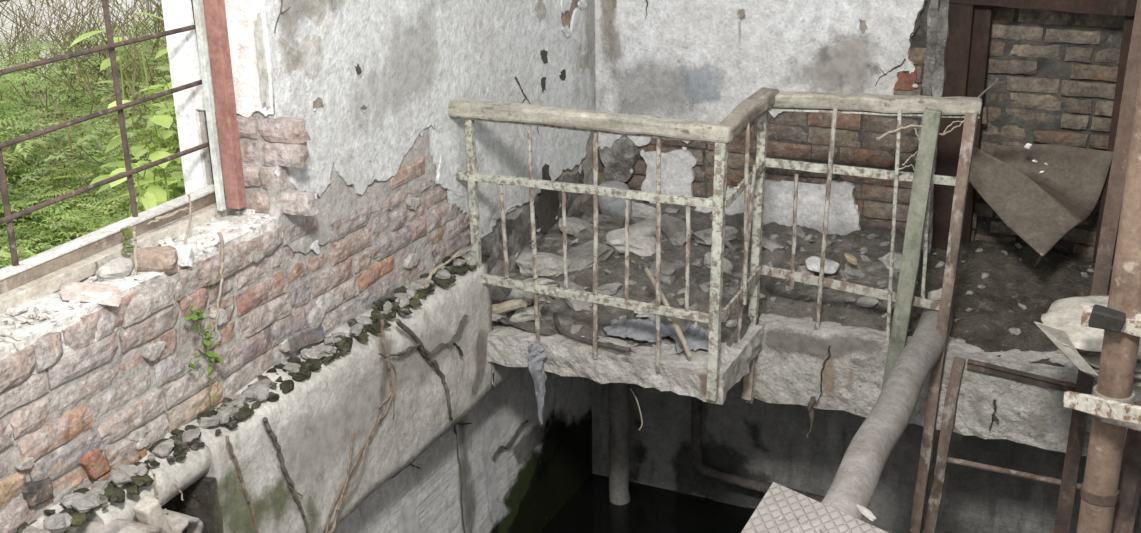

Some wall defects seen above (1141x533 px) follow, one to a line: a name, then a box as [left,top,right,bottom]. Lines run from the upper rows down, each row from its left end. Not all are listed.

crack [274,0,290,33]
flaking render [535,0,547,23]
flaking render [561,0,587,37]
flaking render [891,47,926,96]
flaking render [598,111,921,233]
flaking render [0,97,609,533]
spalling [629,380,866,499]
spalling [856,423,1066,533]
spalling [1069,456,1087,533]